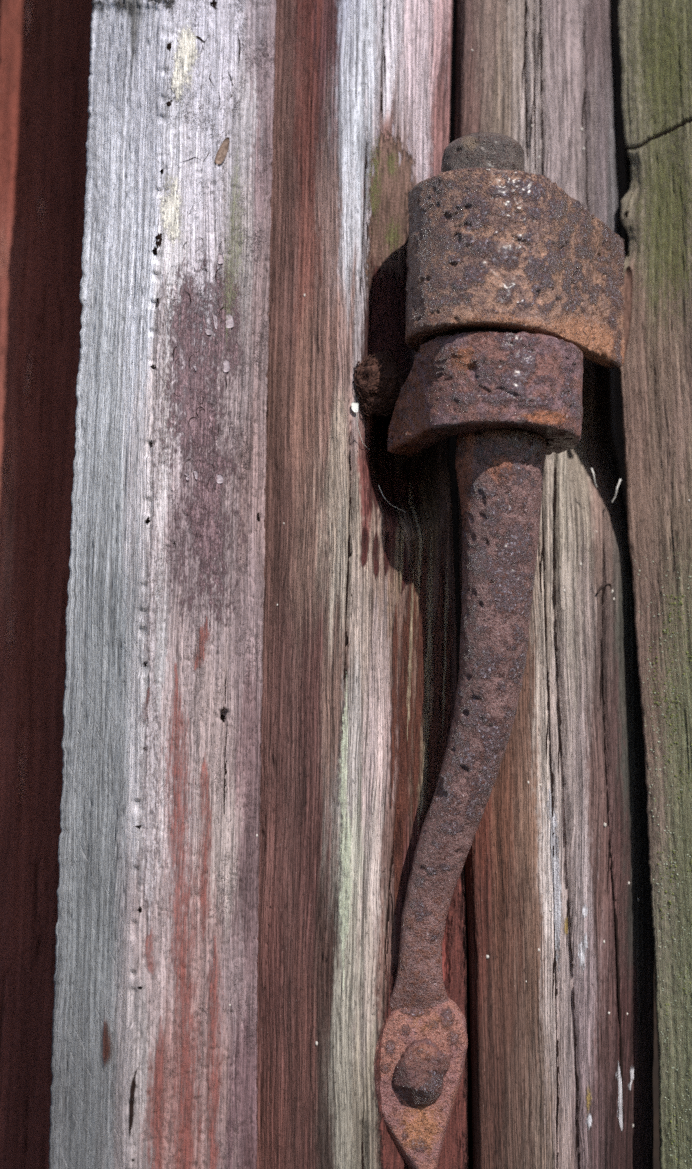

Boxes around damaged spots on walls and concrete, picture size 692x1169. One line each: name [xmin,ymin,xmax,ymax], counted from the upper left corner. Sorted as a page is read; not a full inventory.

crack [624,119,692,164]
corrosion [362,257,411,375]
corrosion [361,411,453,914]